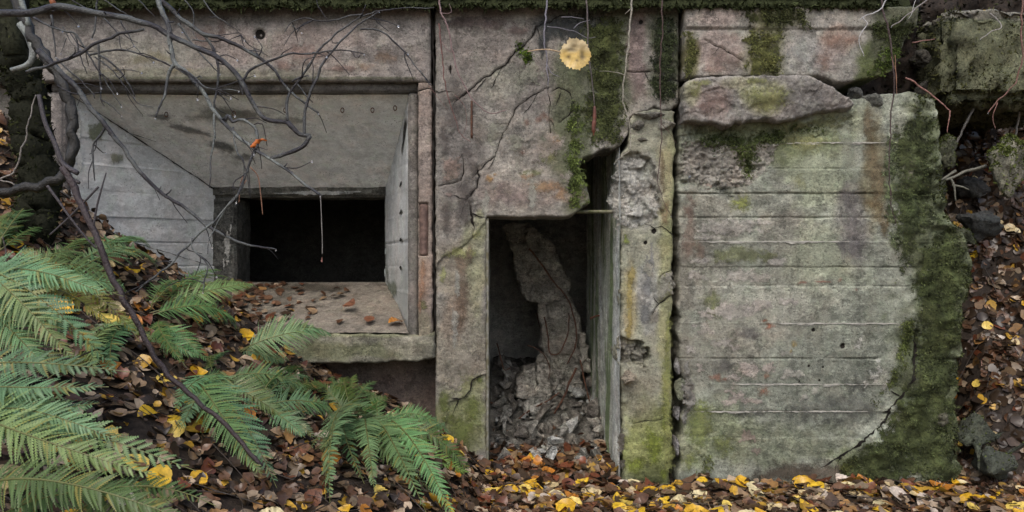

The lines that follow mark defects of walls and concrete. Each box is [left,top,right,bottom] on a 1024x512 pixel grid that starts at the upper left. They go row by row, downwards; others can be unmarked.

crack [413,14,581,339]
spalling [606,157,661,230]
spalling [618,335,648,366]
crack [452,374,484,415]
crack [824,340,917,469]